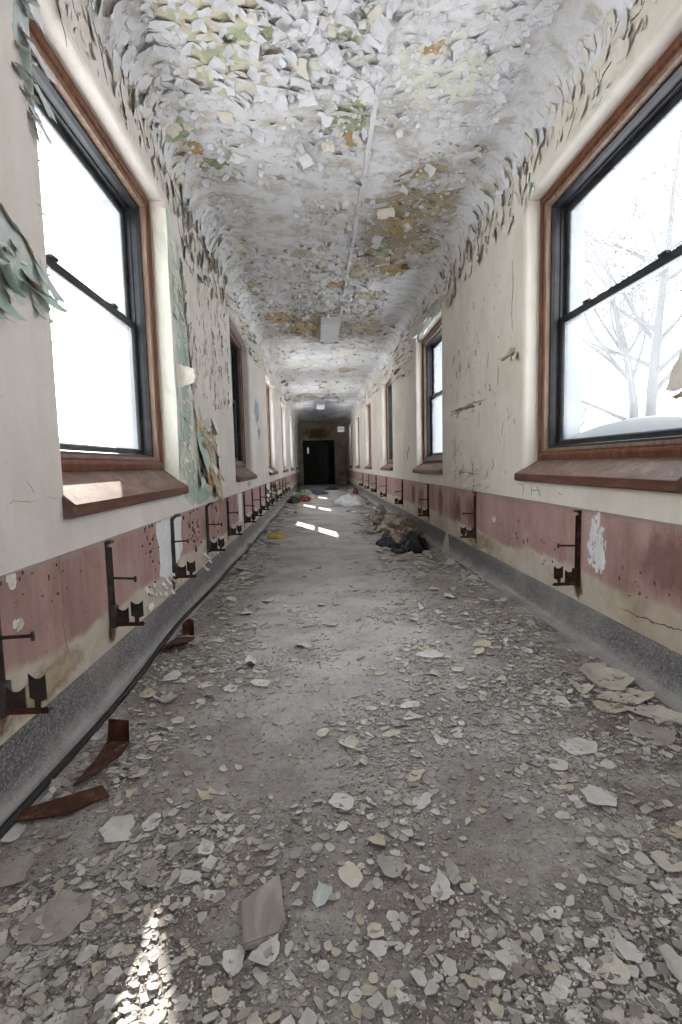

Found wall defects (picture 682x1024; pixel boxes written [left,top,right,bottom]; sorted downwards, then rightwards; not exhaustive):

peeling [0,200,69,329]
peeling [58,0,657,571]